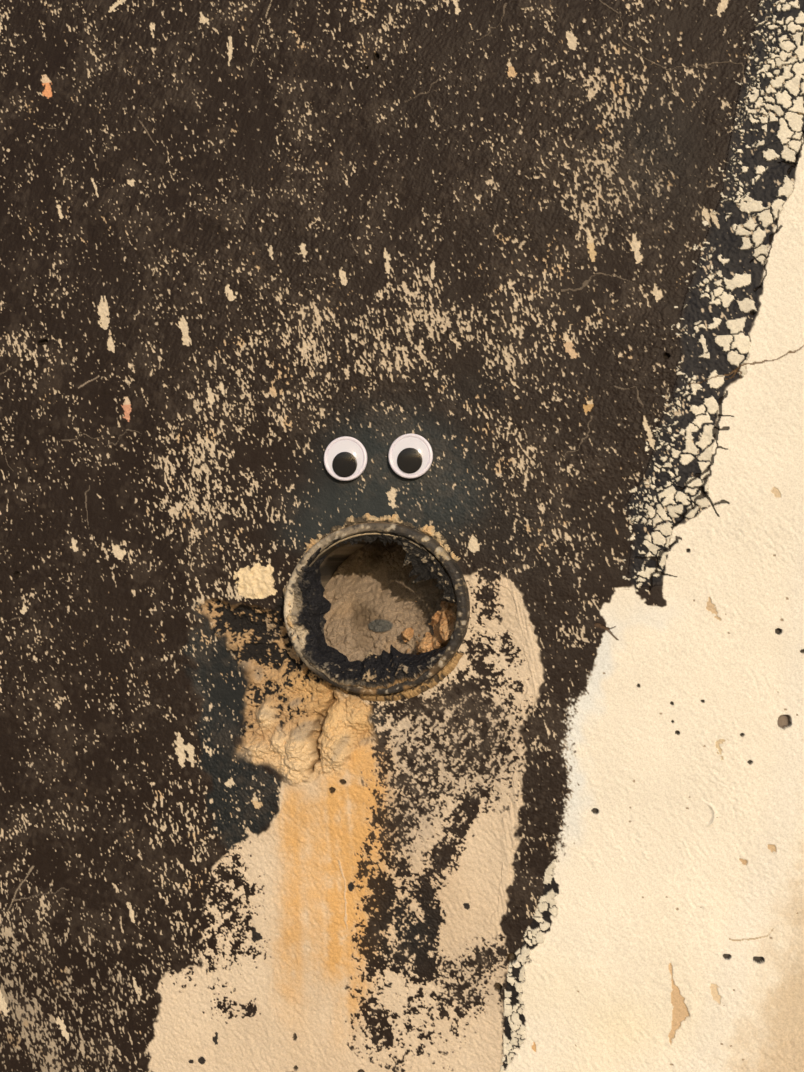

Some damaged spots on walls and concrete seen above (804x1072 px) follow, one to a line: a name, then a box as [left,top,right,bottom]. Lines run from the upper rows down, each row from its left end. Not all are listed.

crack [469,3,508,44]
peeling [717,0,729,17]
crack [405,69,451,103]
peeling [560,18,700,264]
peeling [702,206,720,229]
crack [561,273,634,292]
peeling [653,284,663,303]
crack [600,0,804,592]
peeling [643,416,656,451]
peeling [148,479,587,1072]
rust [266,738,399,1050]
peeling [669,963,690,1045]